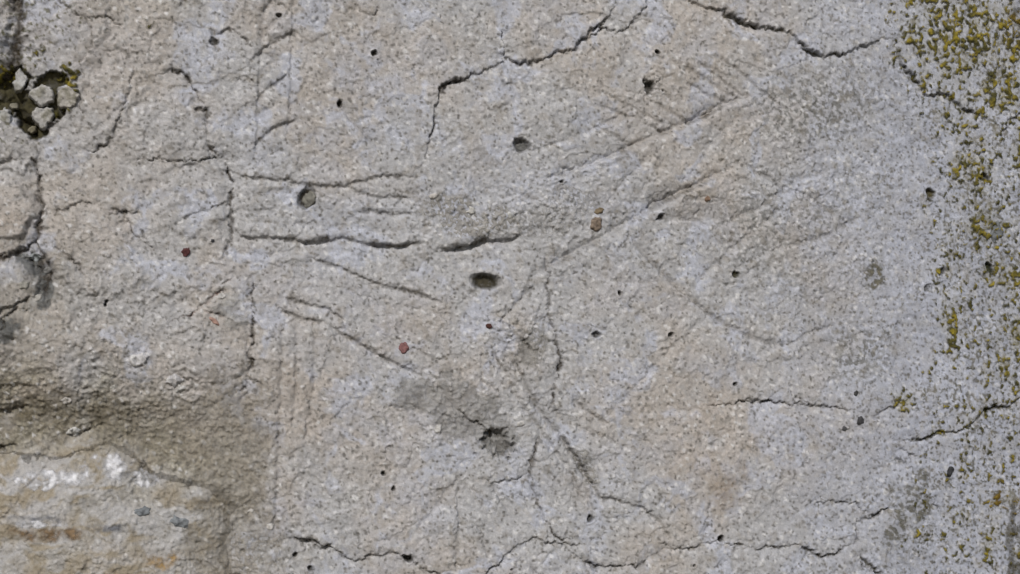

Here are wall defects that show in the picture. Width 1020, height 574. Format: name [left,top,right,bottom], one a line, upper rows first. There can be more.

crack [2,0,25,80]
crack [0,161,74,283]